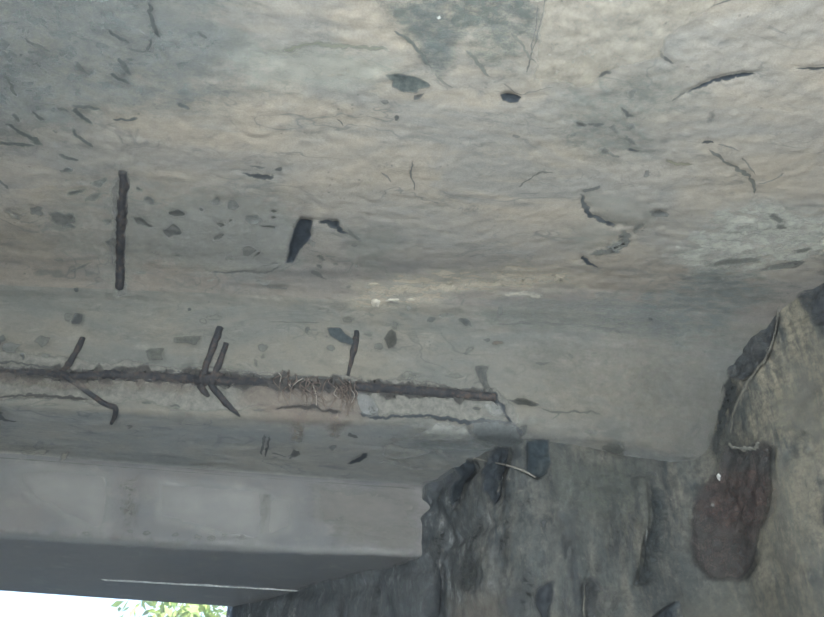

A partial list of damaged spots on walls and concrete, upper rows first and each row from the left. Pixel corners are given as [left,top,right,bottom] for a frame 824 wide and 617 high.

rust [247,386,360,439]